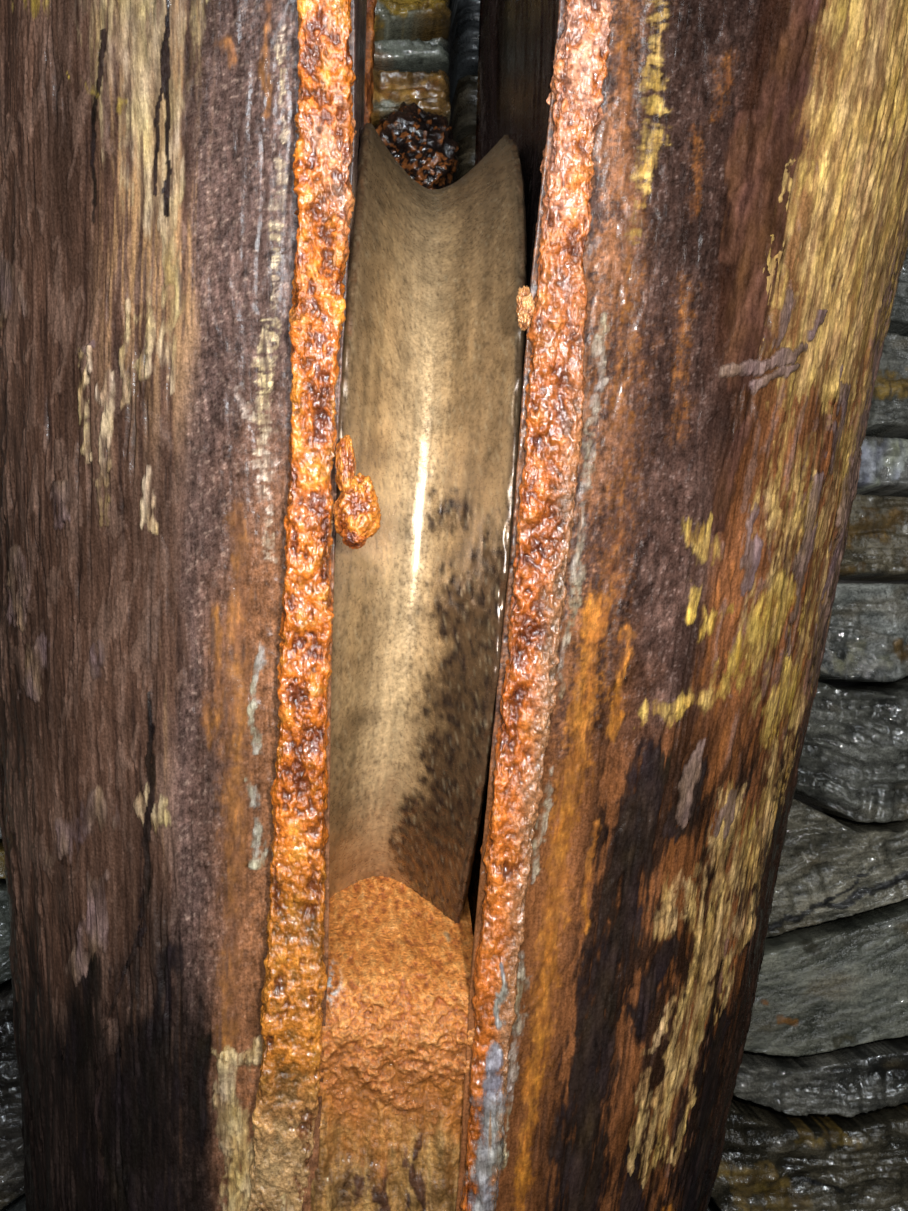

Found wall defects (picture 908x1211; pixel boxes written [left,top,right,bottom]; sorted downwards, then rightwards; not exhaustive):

crack [91,28,107,223]
crack [153,0,172,217]
corrosion [519,600,600,1186]